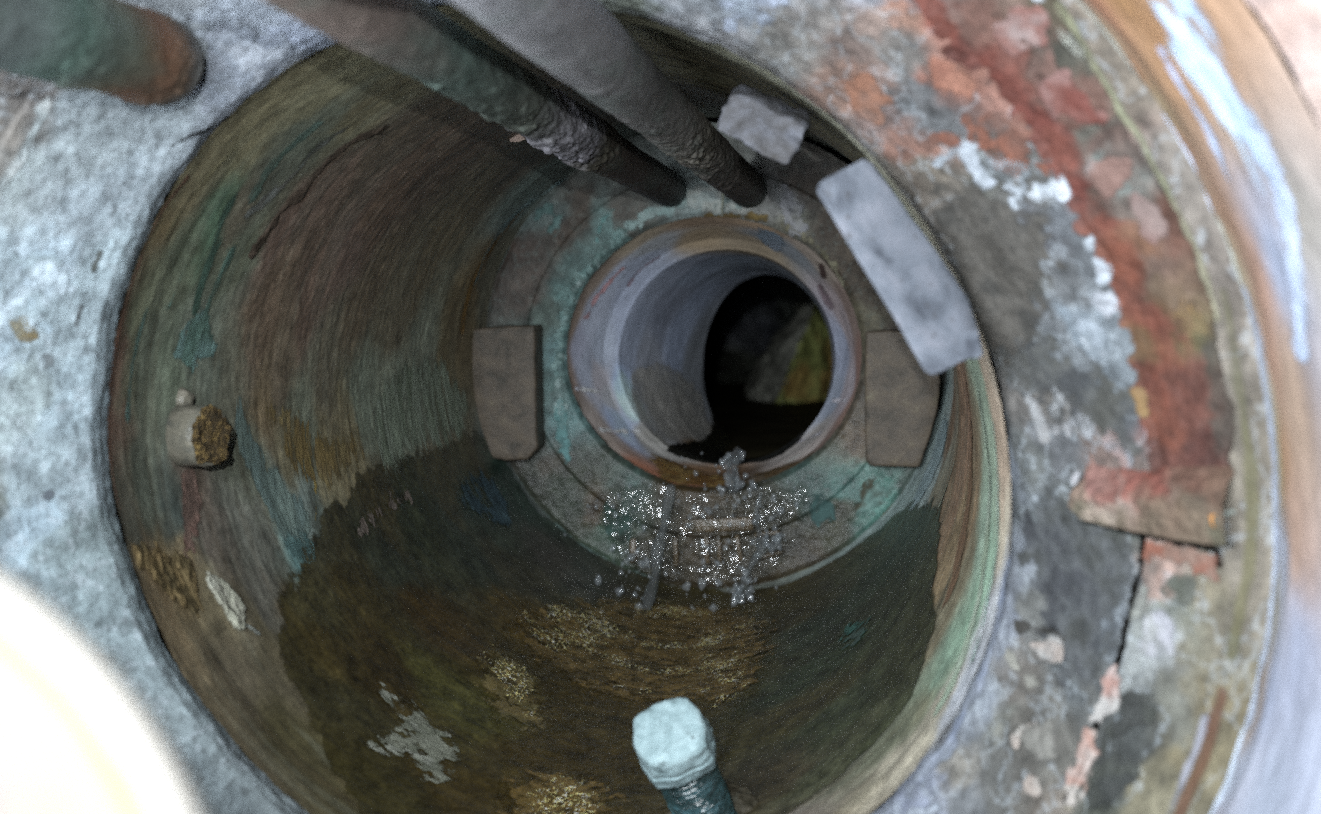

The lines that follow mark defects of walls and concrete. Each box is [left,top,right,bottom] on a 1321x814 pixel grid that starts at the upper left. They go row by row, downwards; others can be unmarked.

corrosion [838,72,893,125]
corrosion [923,57,1049,181]
damp [931,140,1142,469]
damp [906,391,1197,814]
crack [1083,520,1220,674]
peeling [1058,665,1120,811]
crack [1092,715,1105,742]